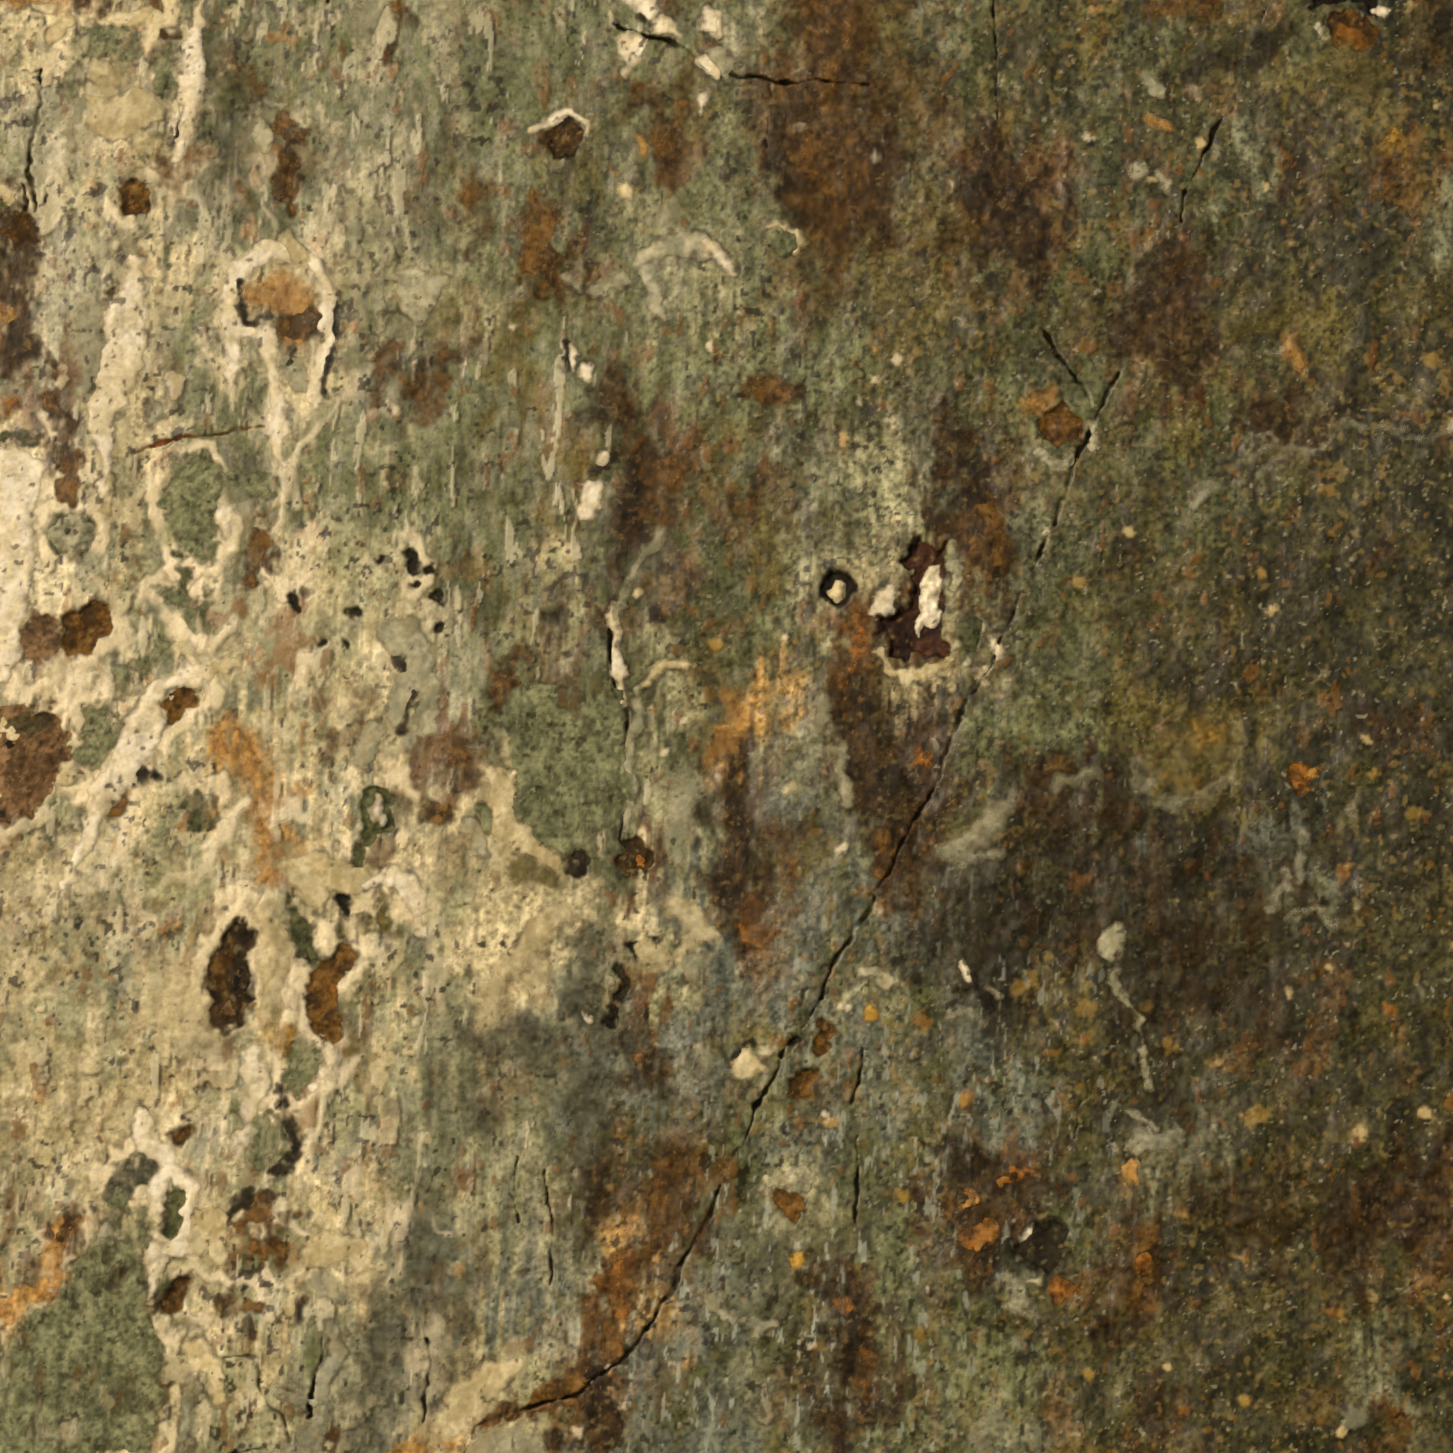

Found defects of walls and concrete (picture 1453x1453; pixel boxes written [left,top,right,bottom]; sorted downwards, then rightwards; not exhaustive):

crack [613,22,869,86]
rust [765,0,896,285]
crack [1042,330,1120,469]
spalling [0,640,173,824]
crack [607,627,629,734]
spalling [819,570,857,607]
spalling [869,537,964,691]
crack [740,609,1015,1148]
spalling [205,916,257,1036]
crack [849,1050,863,1223]
rust [471,1145,709,1453]
crack [520,1185,721,1411]